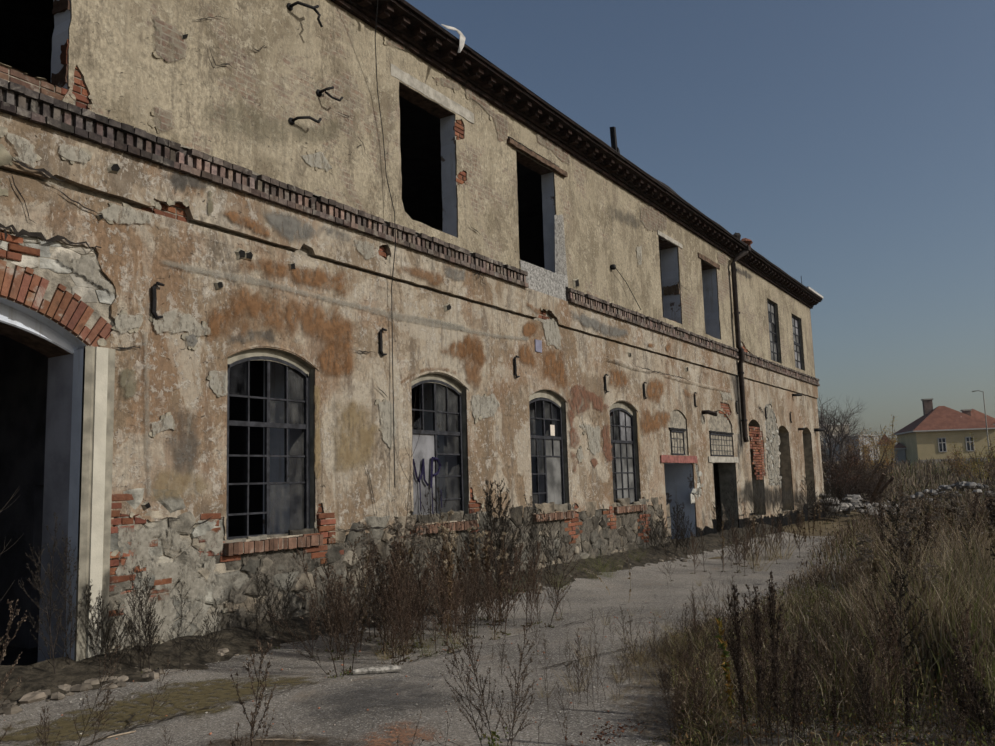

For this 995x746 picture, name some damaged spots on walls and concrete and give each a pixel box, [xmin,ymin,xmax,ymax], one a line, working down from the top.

spalling [52,0,71,15]
spalling [0,39,94,112]
crack [0,156,102,250]
peeling [95,198,190,225]
spalling [0,232,212,350]
spalling [108,488,241,652]
flaking render [302,503,344,564]